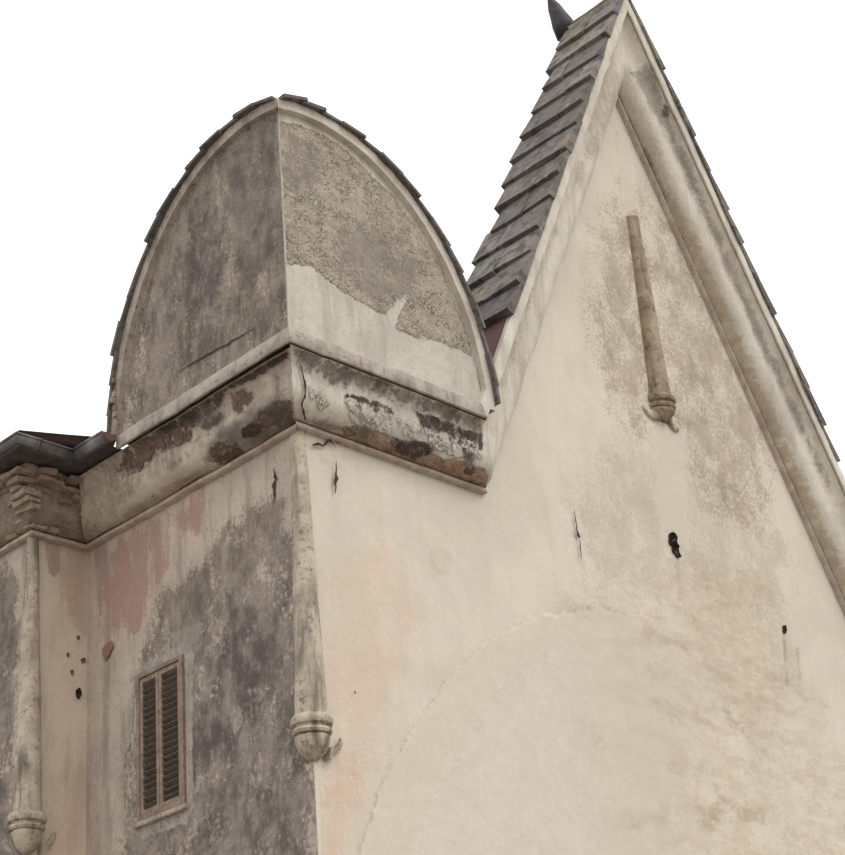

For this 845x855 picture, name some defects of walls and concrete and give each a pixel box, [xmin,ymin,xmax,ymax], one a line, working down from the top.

water stain [187,117,283,347]
spalling [280,121,472,356]
spalling [115,352,294,474]
crack [299,364,307,421]
crack [312,439,341,494]
spalling [341,397,488,487]
water stain [141,495,286,669]
crack [574,510,582,559]
hole [668,532,682,558]